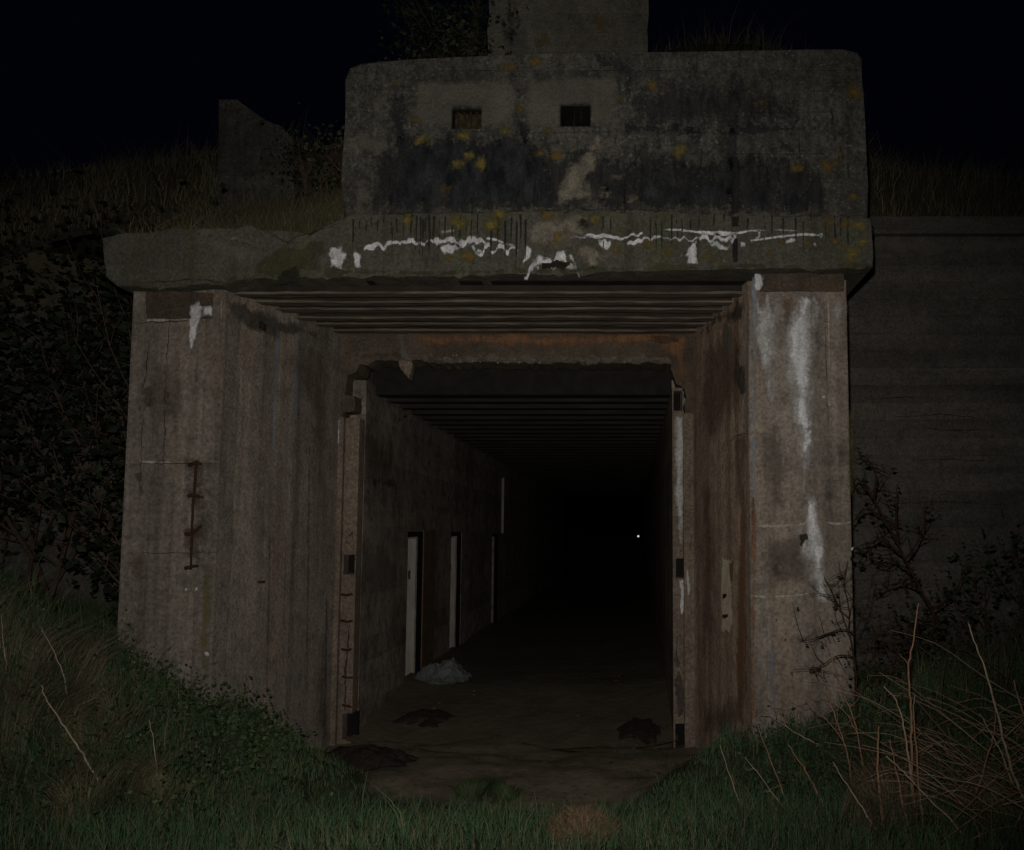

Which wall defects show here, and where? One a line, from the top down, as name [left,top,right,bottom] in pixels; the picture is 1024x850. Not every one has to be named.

water stain [329,74,849,269]
water stain [189,301,316,449]
corrosion [417,333,685,373]
water stain [706,278,757,456]
water stain [787,297,812,484]
corrosion [184,460,204,570]
water stain [799,499,827,601]